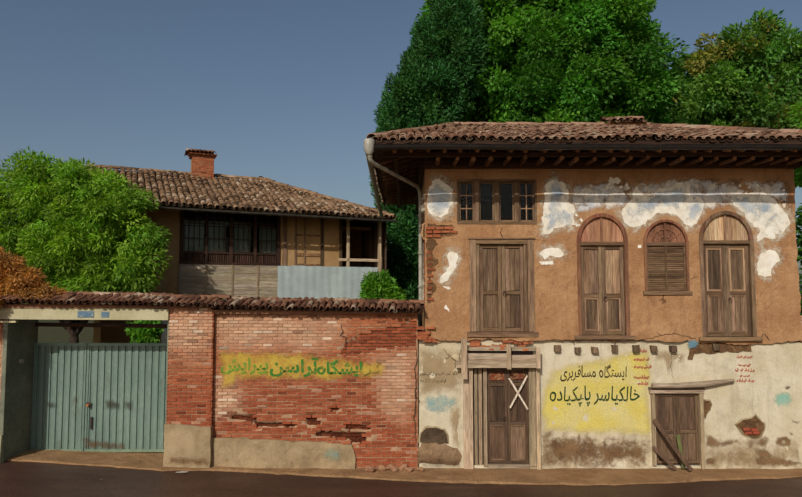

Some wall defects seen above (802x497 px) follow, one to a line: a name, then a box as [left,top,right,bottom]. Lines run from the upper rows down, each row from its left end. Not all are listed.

peeling [421,175,461,307]
peeling [537,172,794,280]
flaking render [688,342,752,360]
spalling [232,415,295,427]
spalling [307,417,371,443]
flaking render [734,413,766,439]
water stain [542,433,645,466]
water stain [707,434,797,465]